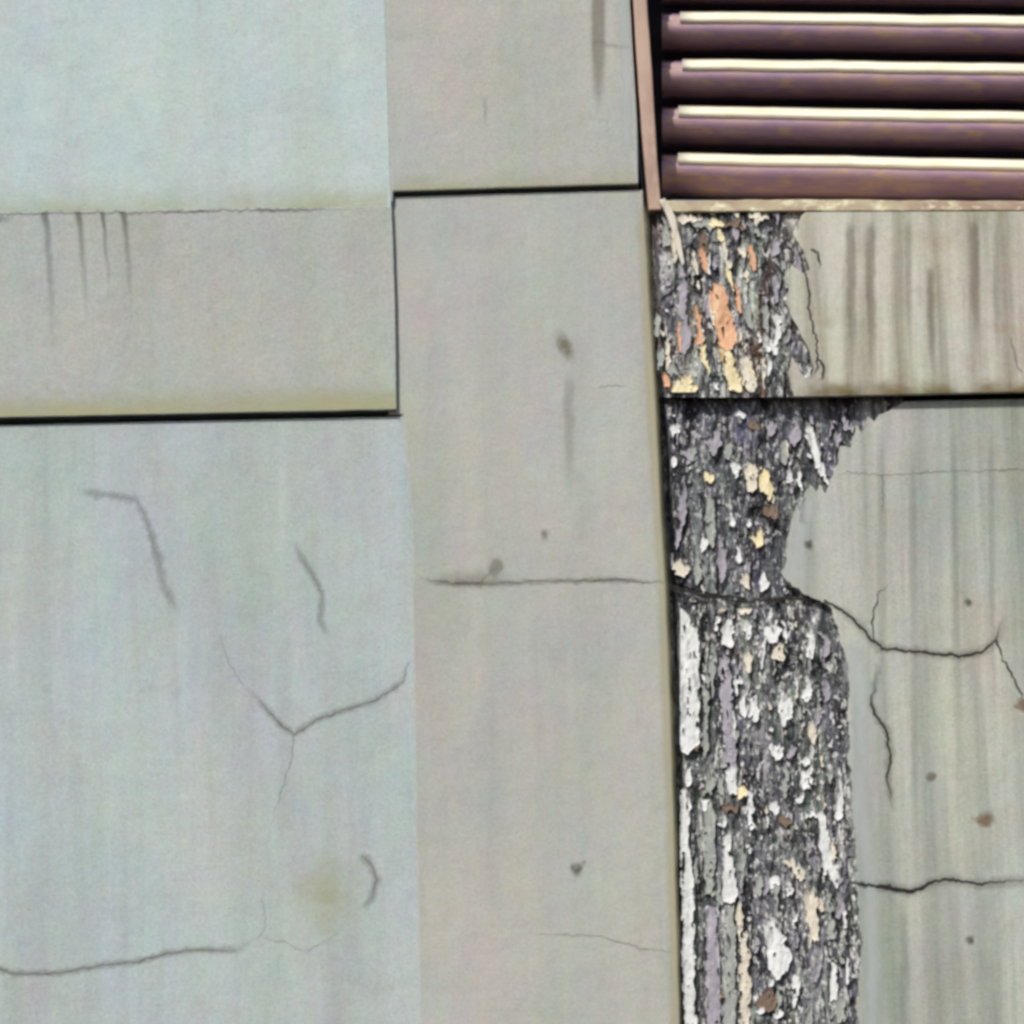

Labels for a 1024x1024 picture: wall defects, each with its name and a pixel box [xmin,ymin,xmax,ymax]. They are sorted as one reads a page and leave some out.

spalling [650,207,904,1024]
crack [665,583,1021,693]
crack [871,695,892,783]
crack [848,878,997,893]